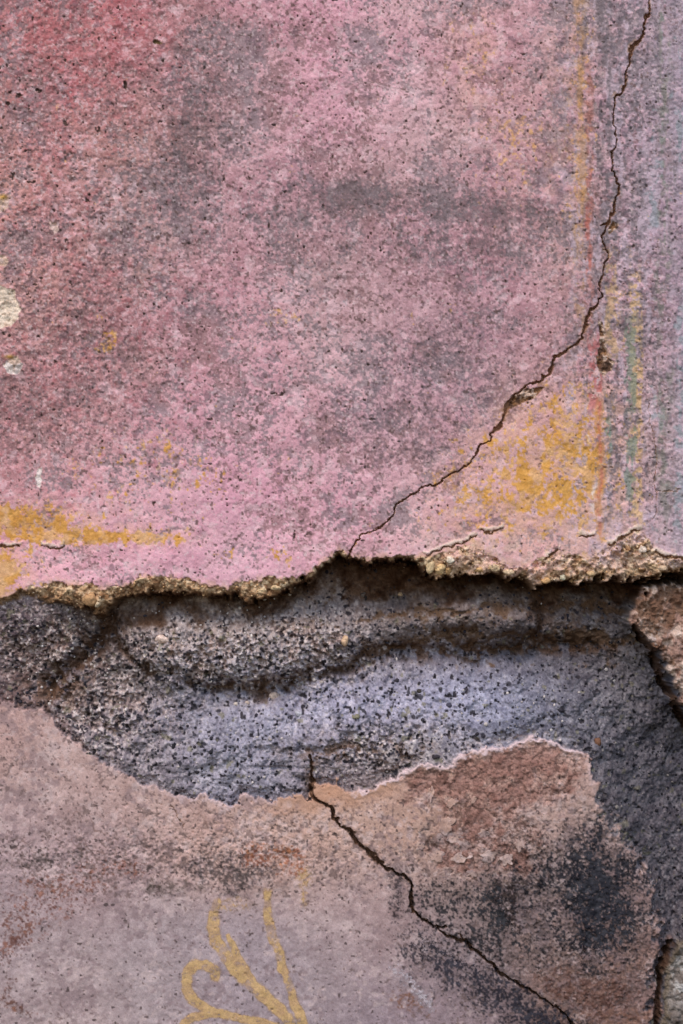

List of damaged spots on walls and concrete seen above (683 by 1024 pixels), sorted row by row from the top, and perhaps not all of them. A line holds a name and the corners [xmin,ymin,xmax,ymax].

crack [349,0,651,554]
spalling [0,528,683,1024]
crack [308,754,575,1024]